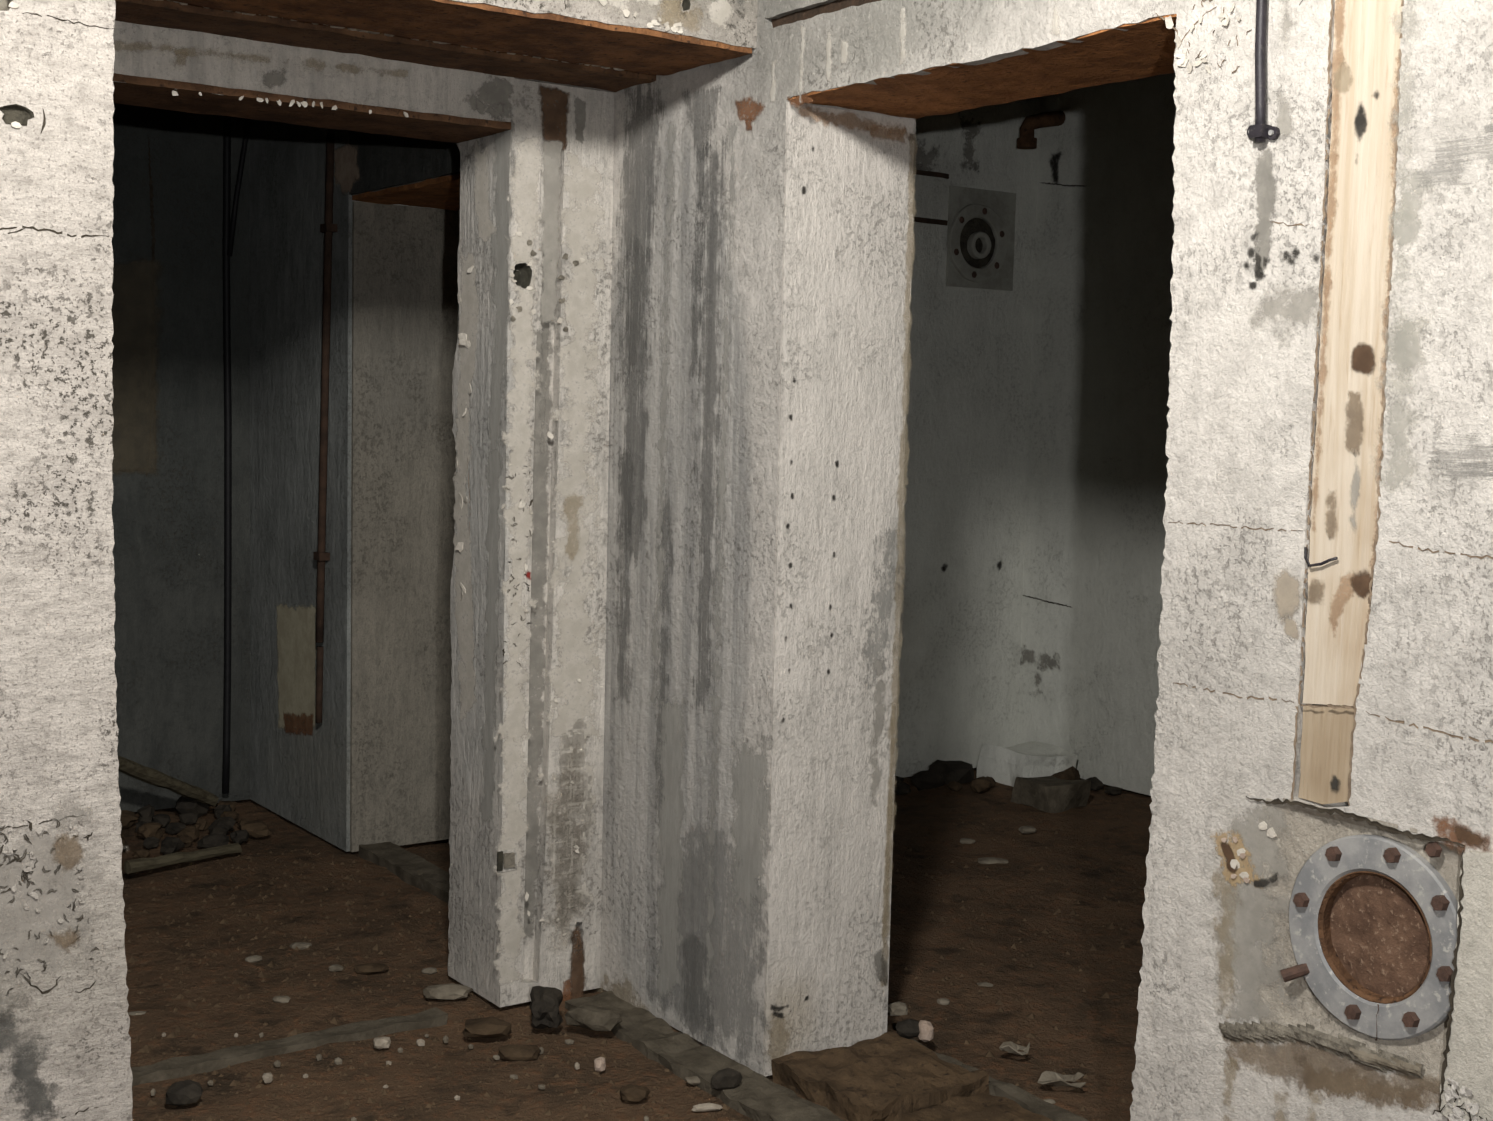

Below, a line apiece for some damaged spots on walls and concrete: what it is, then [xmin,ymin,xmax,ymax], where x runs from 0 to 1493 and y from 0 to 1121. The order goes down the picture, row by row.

peeling [599,0,734,34]
damp [826,34,848,81]
damp [616,84,773,1058]
corrosion [562,927,585,1001]
corrosion [1318,871,1432,1004]